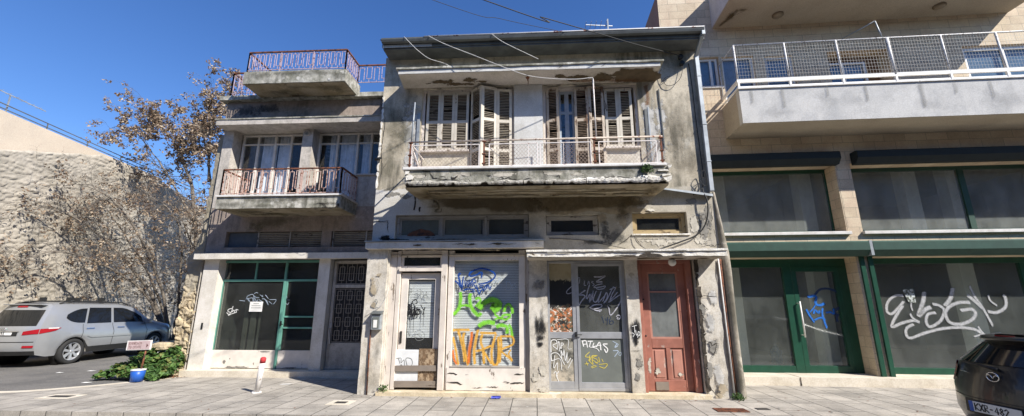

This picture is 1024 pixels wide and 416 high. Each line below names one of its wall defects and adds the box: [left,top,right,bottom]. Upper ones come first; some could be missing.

spalling [376,68,672,228]
spalling [606,237,728,411]